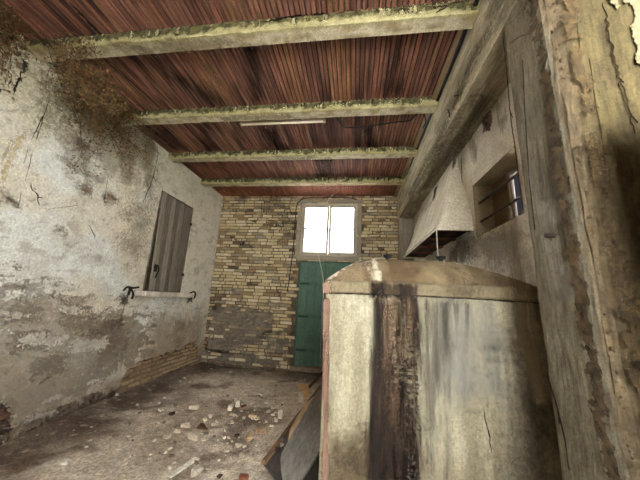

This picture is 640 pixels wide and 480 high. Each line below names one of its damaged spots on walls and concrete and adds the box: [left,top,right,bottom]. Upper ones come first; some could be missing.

crack [0,64,22,95]
crack [602,3,638,133]
peeling [610,0,640,64]
crack [18,98,78,209]
spalling [525,0,620,480]
flaking render [121,341,201,387]
leakage [328,259,449,480]